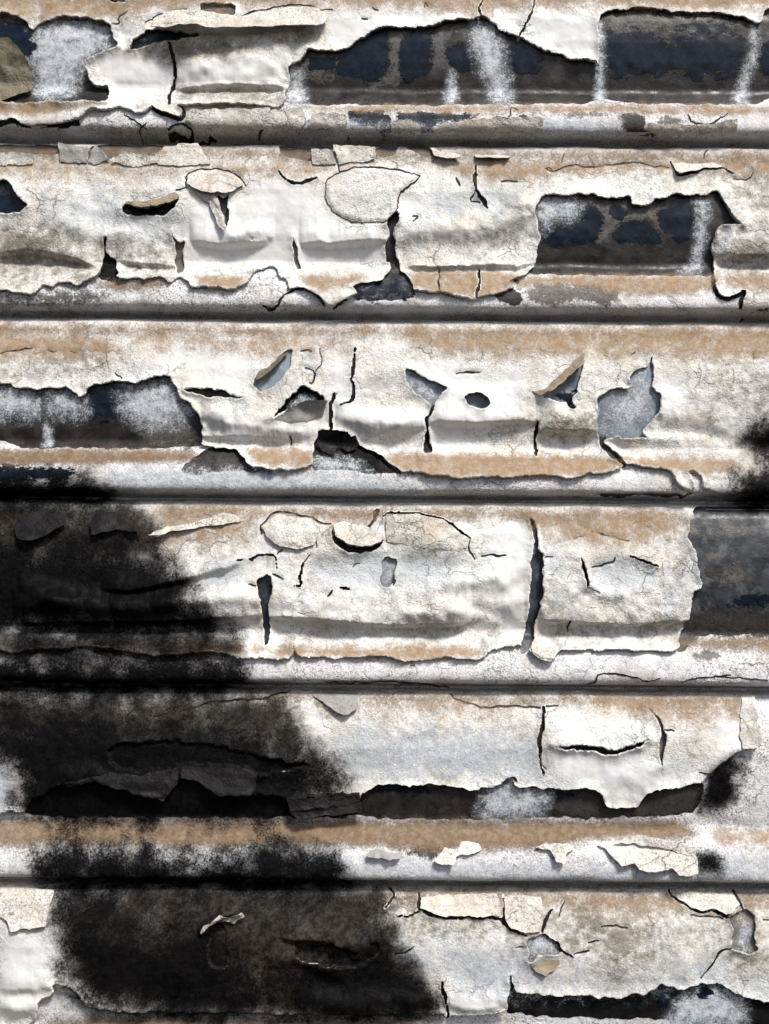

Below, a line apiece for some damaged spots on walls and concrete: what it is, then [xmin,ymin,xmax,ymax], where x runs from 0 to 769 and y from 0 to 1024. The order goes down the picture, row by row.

peeling [0,3,769,231]
peeling [528,192,738,276]
peeling [0,376,272,475]
peeling [595,358,661,468]
peeling [677,506,769,652]
damp [0,417,769,1024]
peeling [57,766,704,822]
crack [441,981,451,1018]
crack [385,887,628,958]
peeling [507,983,769,1024]
crack [700,948,732,979]
crack [668,889,769,920]